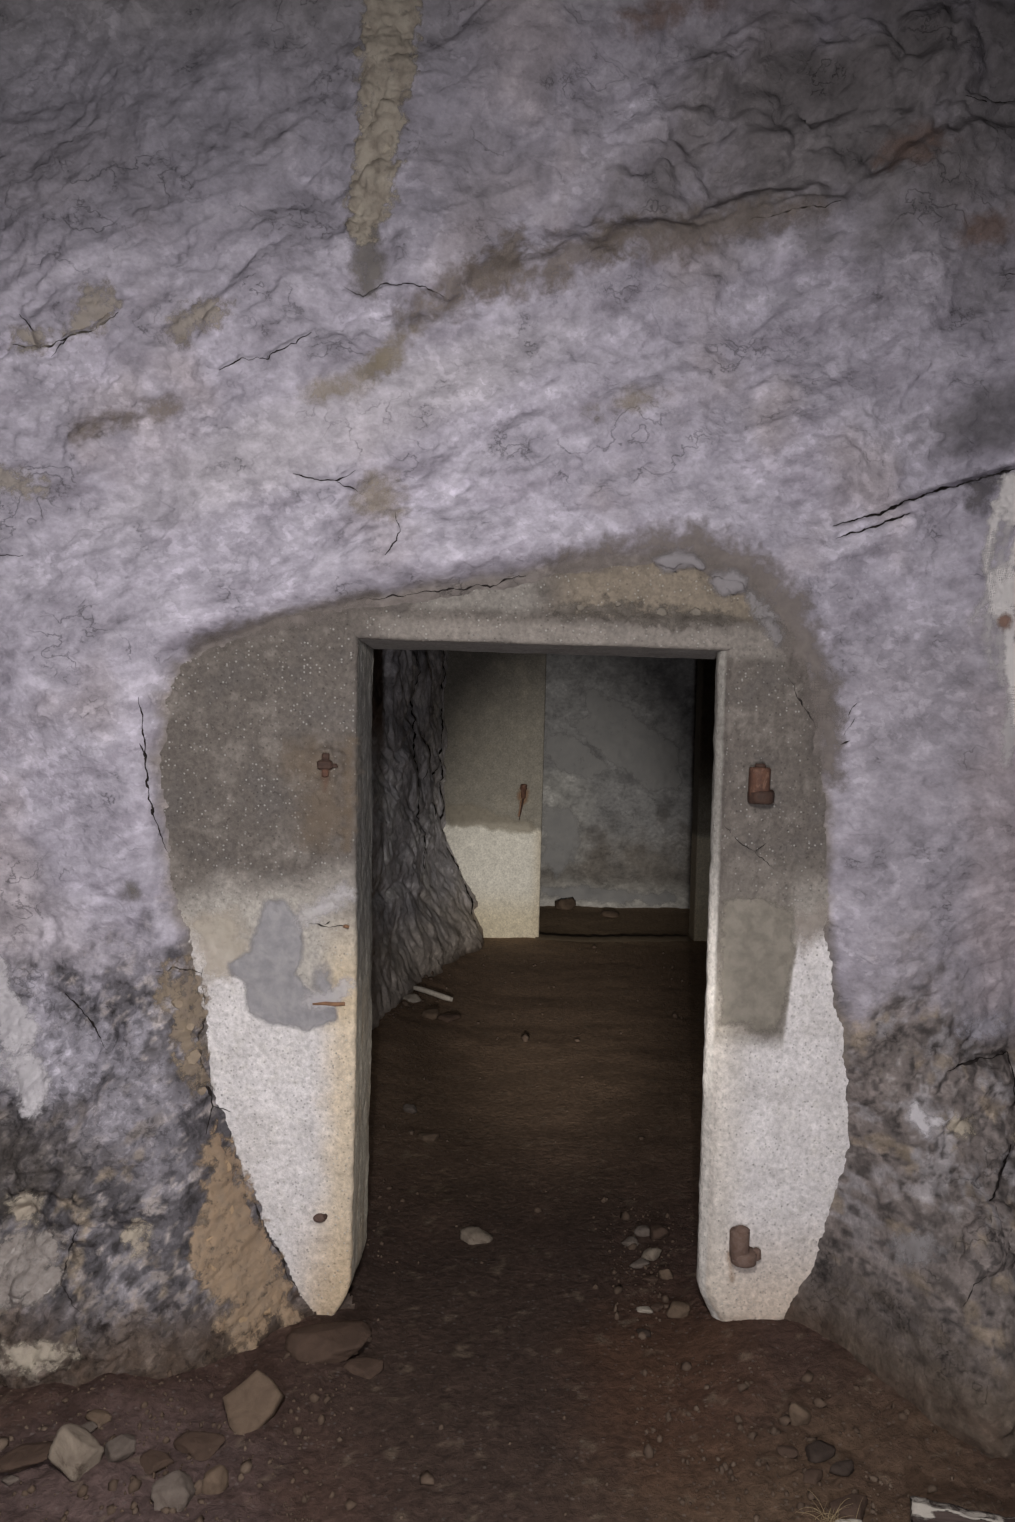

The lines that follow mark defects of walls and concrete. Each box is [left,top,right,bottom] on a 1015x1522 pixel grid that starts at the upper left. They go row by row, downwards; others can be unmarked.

crack [752,200,841,219]
damp [352,226,384,296]
crack [834,469,1015,538]
damp [963,467,1015,764]
crack [948,1051,1015,1106]
crack [989,1145,1011,1201]